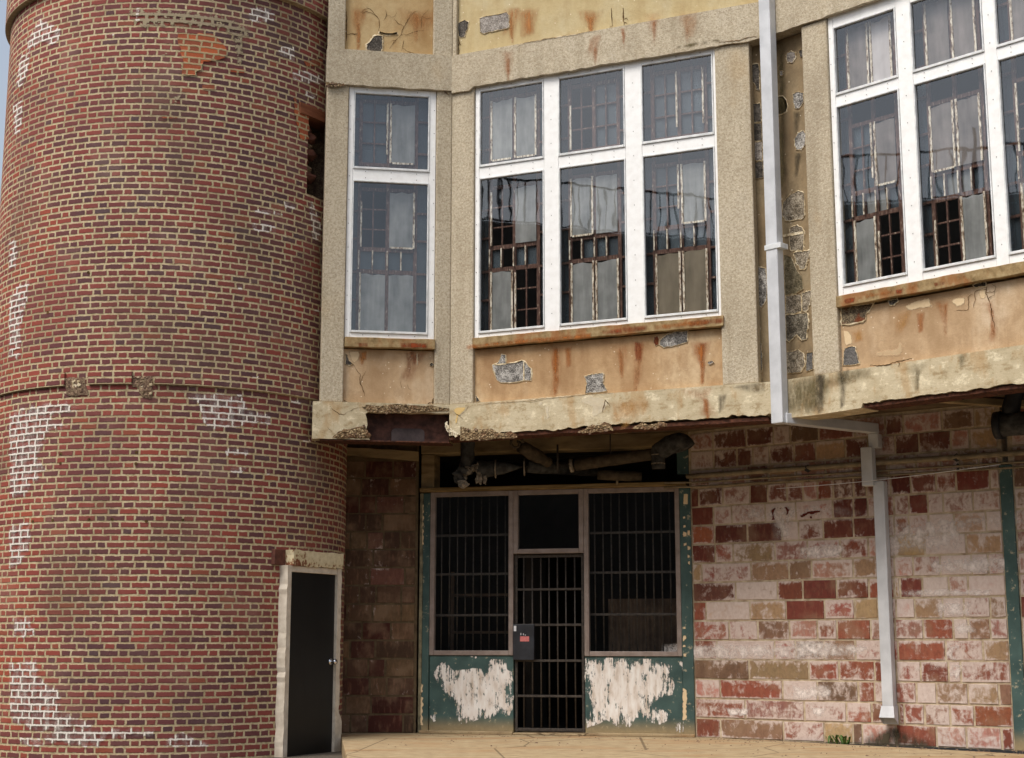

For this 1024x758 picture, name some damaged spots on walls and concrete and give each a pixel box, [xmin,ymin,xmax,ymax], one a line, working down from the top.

crack [346,8,429,53]
spalling [458,12,510,38]
spalling [752,63,764,179]
spalling [758,267,767,308]
spalling [782,190,814,374]
crack [957,284,996,327]
spalling [840,302,875,366]
spalling [492,354,533,384]
leakage [789,375,827,409]
spalling [362,396,517,441]
peeling [434,656,514,724]
peeling [585,627,687,732]